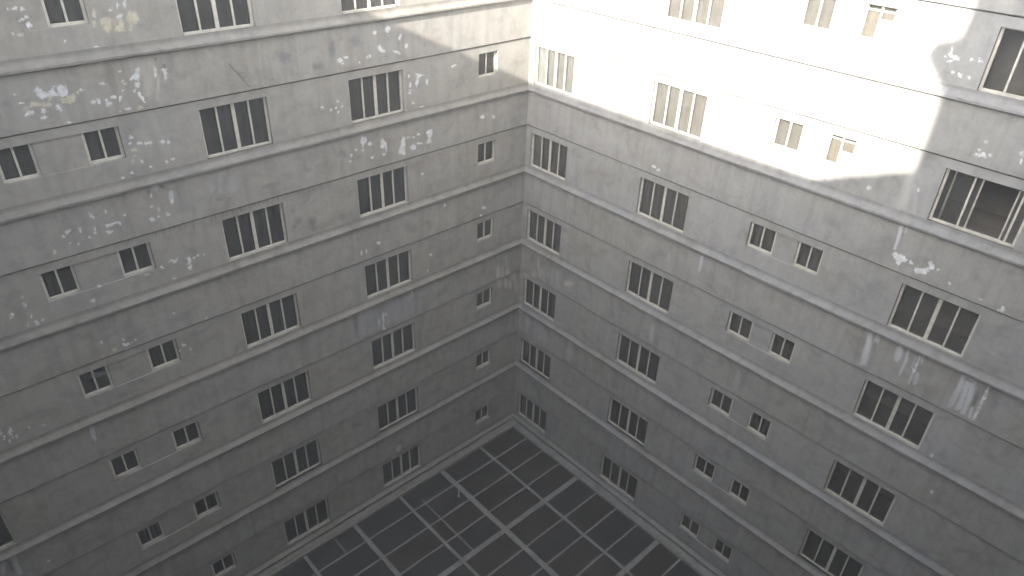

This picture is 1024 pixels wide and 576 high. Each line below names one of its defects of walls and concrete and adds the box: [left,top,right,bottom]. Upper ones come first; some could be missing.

peeling [336,25,408,65]
peeling [927,46,983,79]
peeling [13,67,146,123]
peeling [349,129,433,162]
peeling [62,210,126,245]
peeling [892,252,940,274]
leakage [859,331,880,366]
leakage [894,346,924,386]
leakage [947,375,990,421]